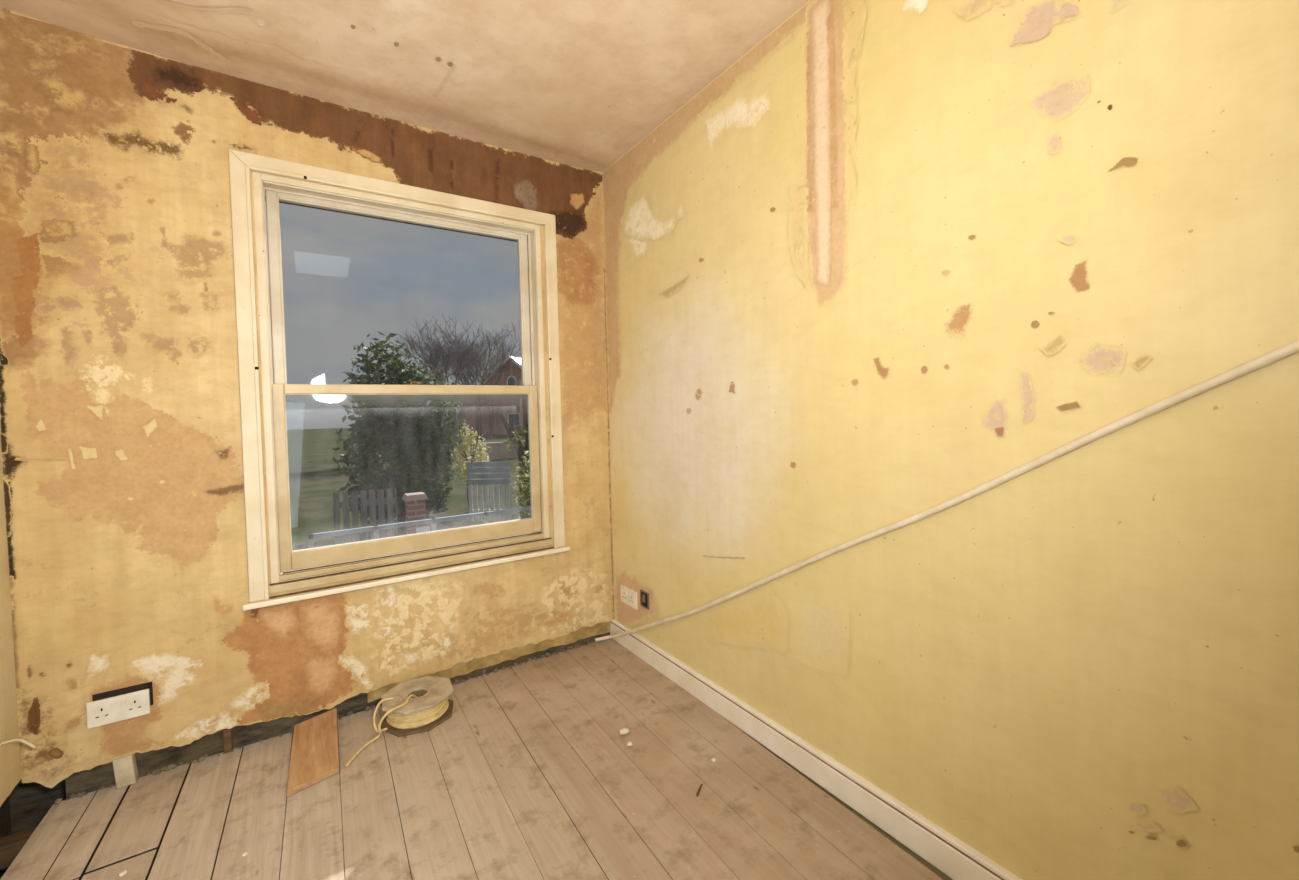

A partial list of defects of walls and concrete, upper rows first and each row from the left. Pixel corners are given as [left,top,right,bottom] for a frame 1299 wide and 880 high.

flaking render [210,136,254,152]
flaking render [556,0,813,439]
flaking render [0,7,244,570]
flaking render [207,592,358,726]
peeling [366,563,658,683]